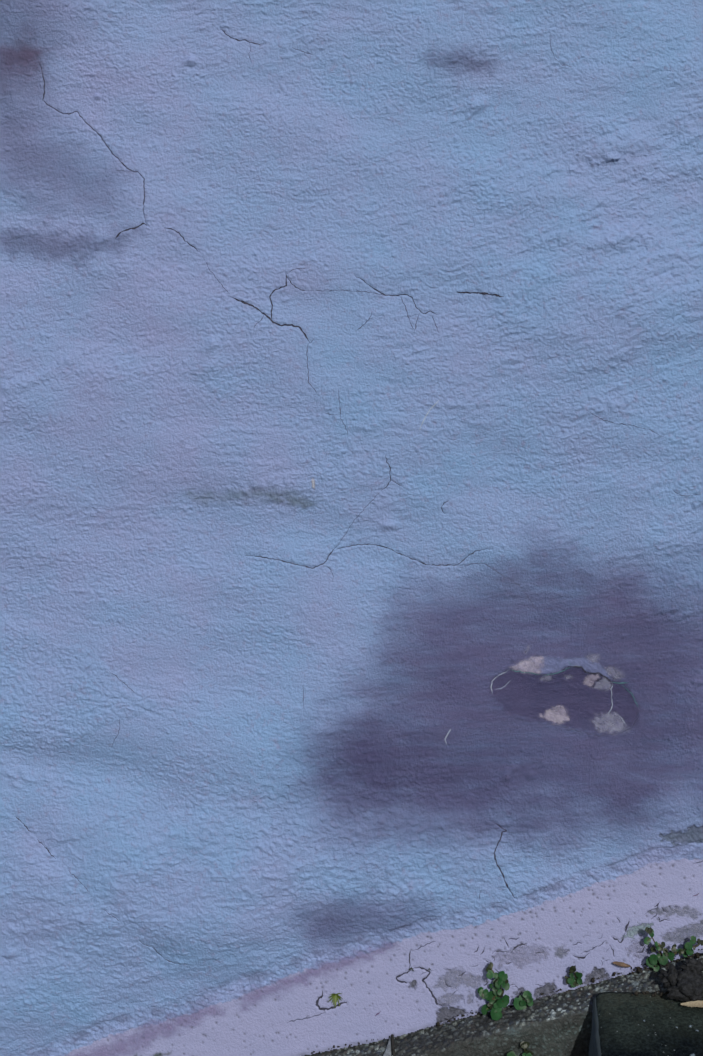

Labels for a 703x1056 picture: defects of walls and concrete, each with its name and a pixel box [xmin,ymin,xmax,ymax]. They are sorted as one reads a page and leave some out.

crack [38,61,439,433]
crack [457,290,504,298]
peeling [491,651,639,736]